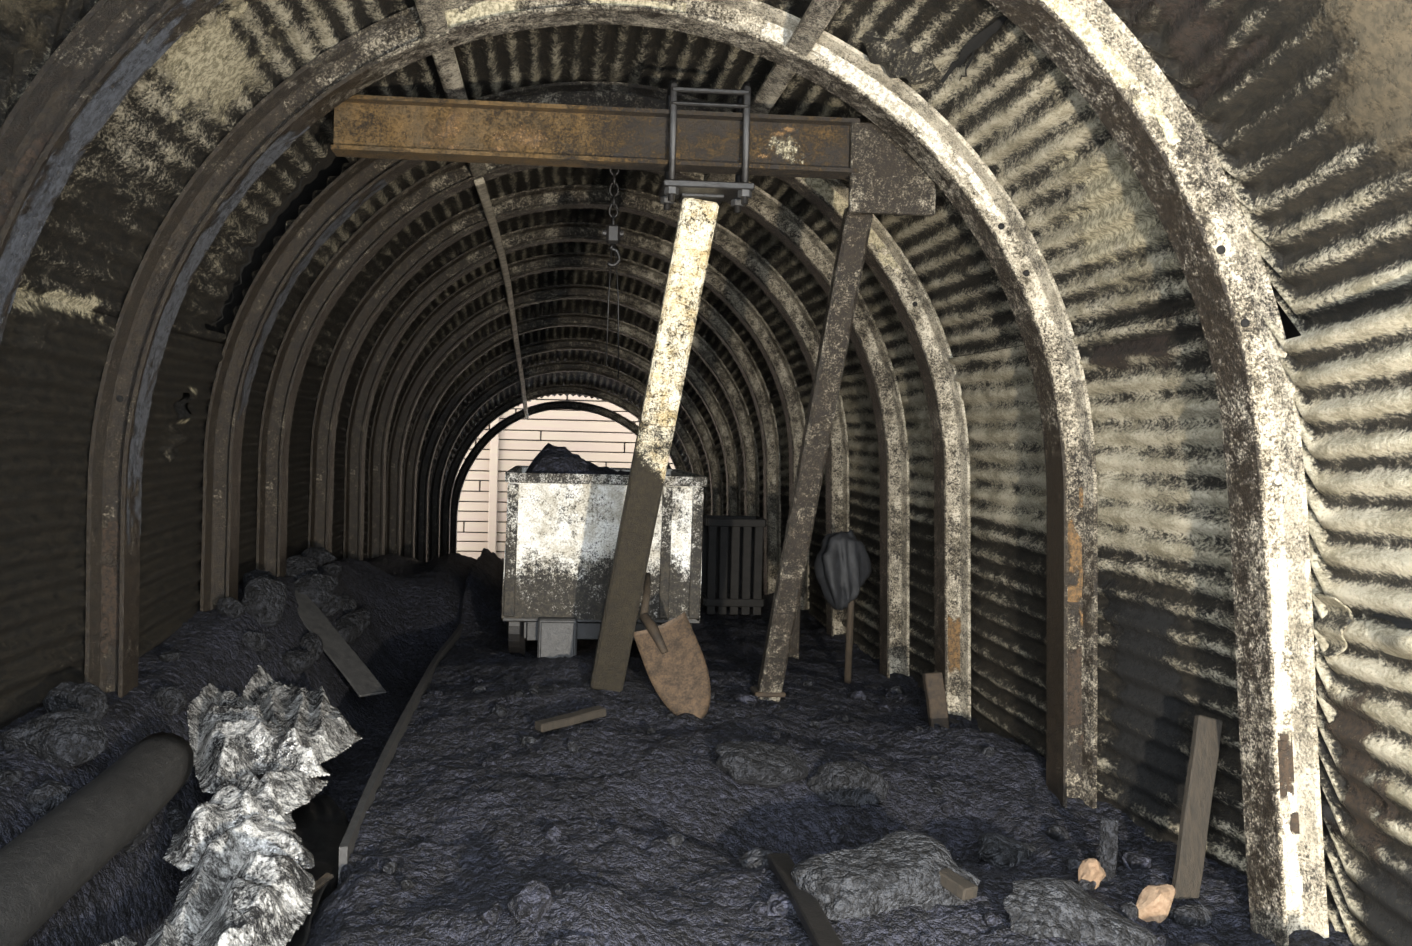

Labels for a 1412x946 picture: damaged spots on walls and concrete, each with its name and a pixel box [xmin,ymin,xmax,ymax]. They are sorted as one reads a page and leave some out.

rust [1068,488,1083,626]